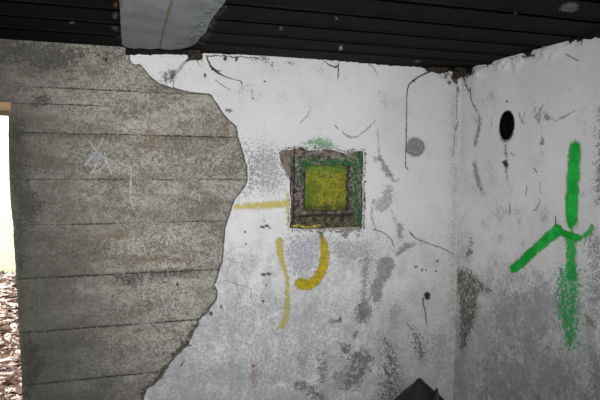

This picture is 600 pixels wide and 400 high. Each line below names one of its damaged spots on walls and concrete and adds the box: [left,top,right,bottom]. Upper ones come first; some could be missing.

crack [205,55,242,88]
spalling [201,55,273,67]
crack [405,71,431,170]
spalling [0,2,248,400]
leakage [456,267,493,355]